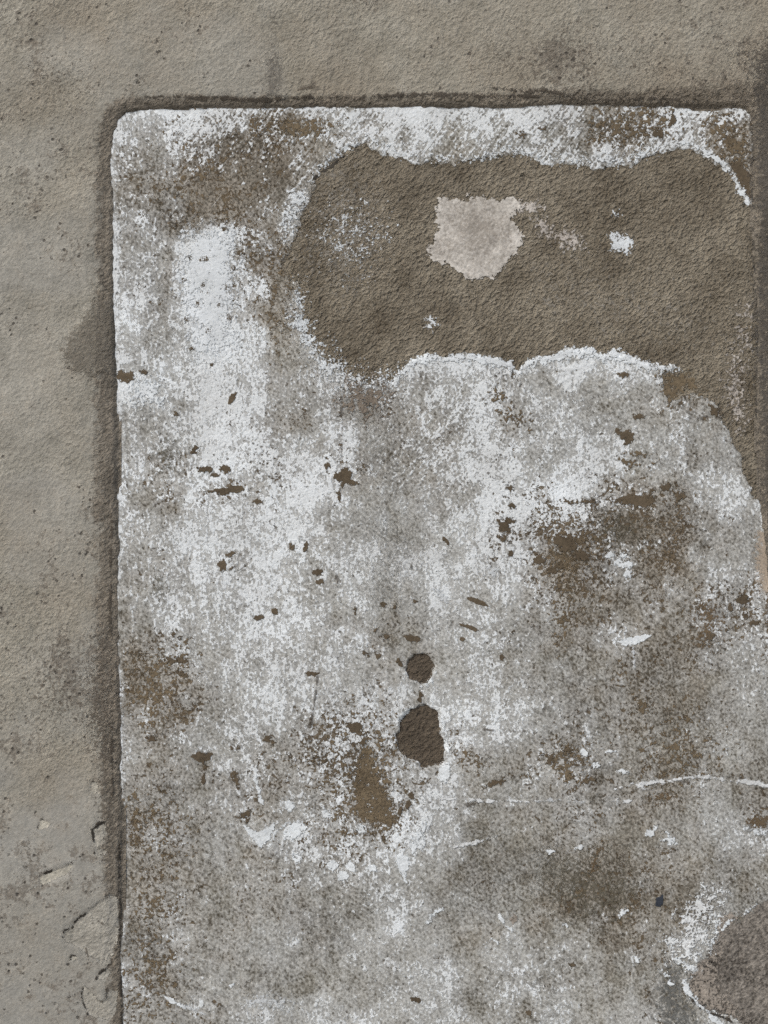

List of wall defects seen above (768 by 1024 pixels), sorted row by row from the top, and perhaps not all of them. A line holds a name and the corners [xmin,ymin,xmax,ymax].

peeling [166,218,247,370]
flaking render [276,105,758,501]
peeling [117,369,179,416]
peeling [395,634,451,783]
peeling [325,860,376,881]